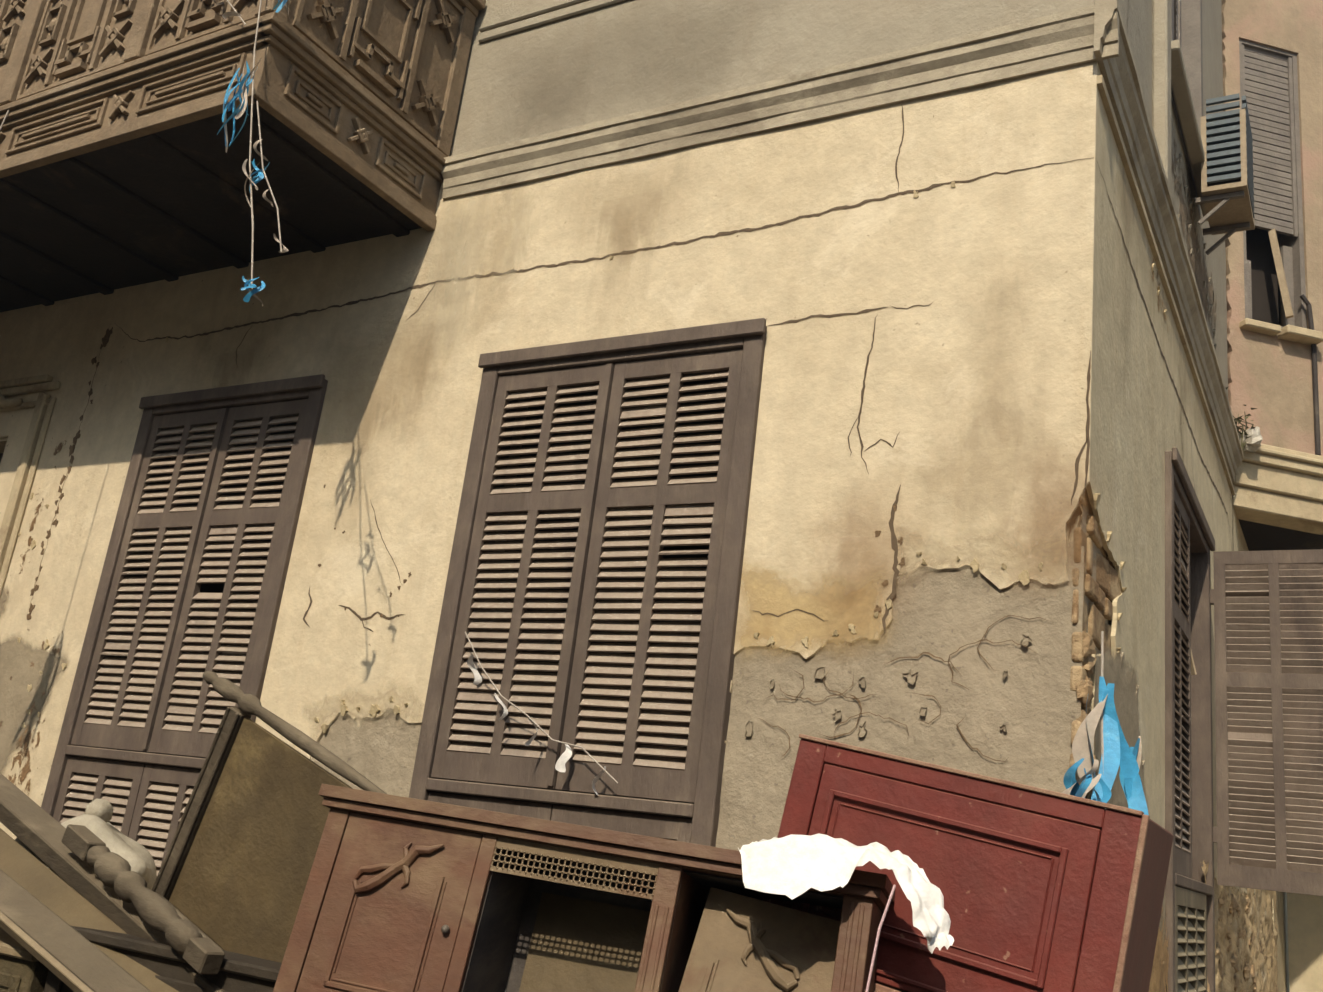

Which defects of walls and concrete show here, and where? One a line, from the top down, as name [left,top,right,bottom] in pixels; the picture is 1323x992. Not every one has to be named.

peeling [1171,139,1218,351]
crack [121,106,1234,551]
spalling [3,327,113,620]
crack [303,500,412,632]
crack [874,485,905,636]
spalling [6,631,67,797]
peeling [309,690,422,798]
peeling [716,488,1127,851]
spalling [1148,905,1169,992]
spalling [1200,860,1279,992]